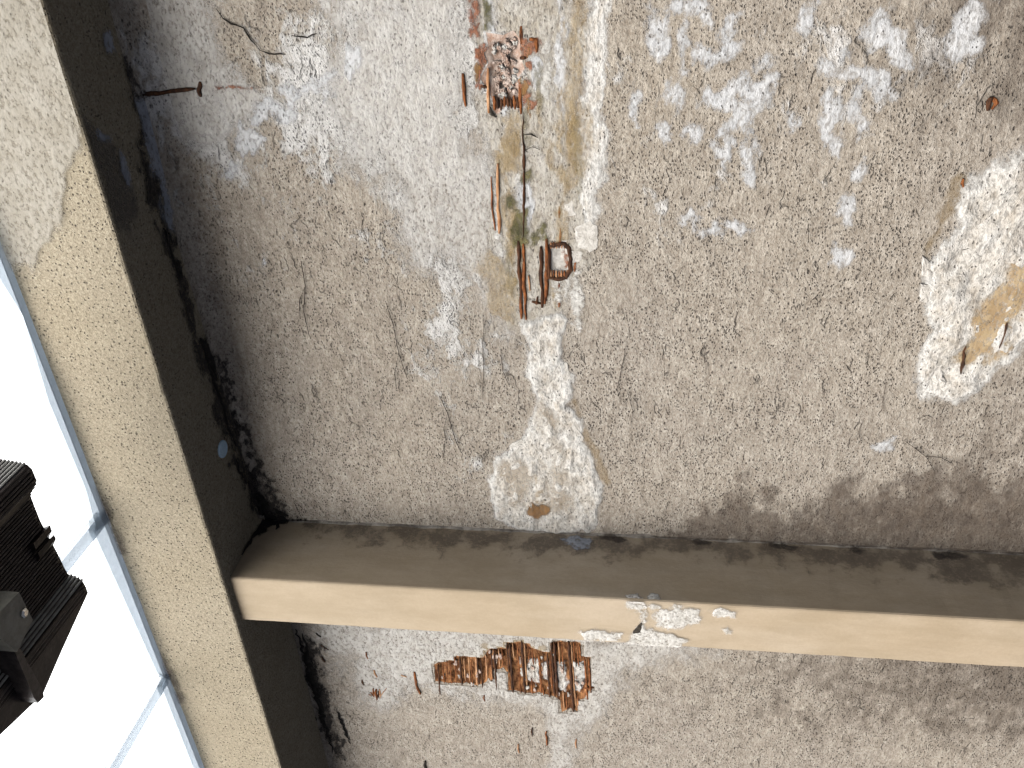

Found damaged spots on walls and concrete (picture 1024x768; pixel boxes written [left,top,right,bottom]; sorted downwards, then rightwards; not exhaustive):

crack [216,9,317,55]
spalling [468,0,542,118]
rust [986,96,999,111]
rust [491,163,501,234]
water stain [104,31,298,519]
water stain [318,0,625,542]
rust [517,239,549,320]
water stain [933,551,967,559]
spalling [434,593,701,712]
peeling [713,608,735,635]
water stain [296,624,698,768]